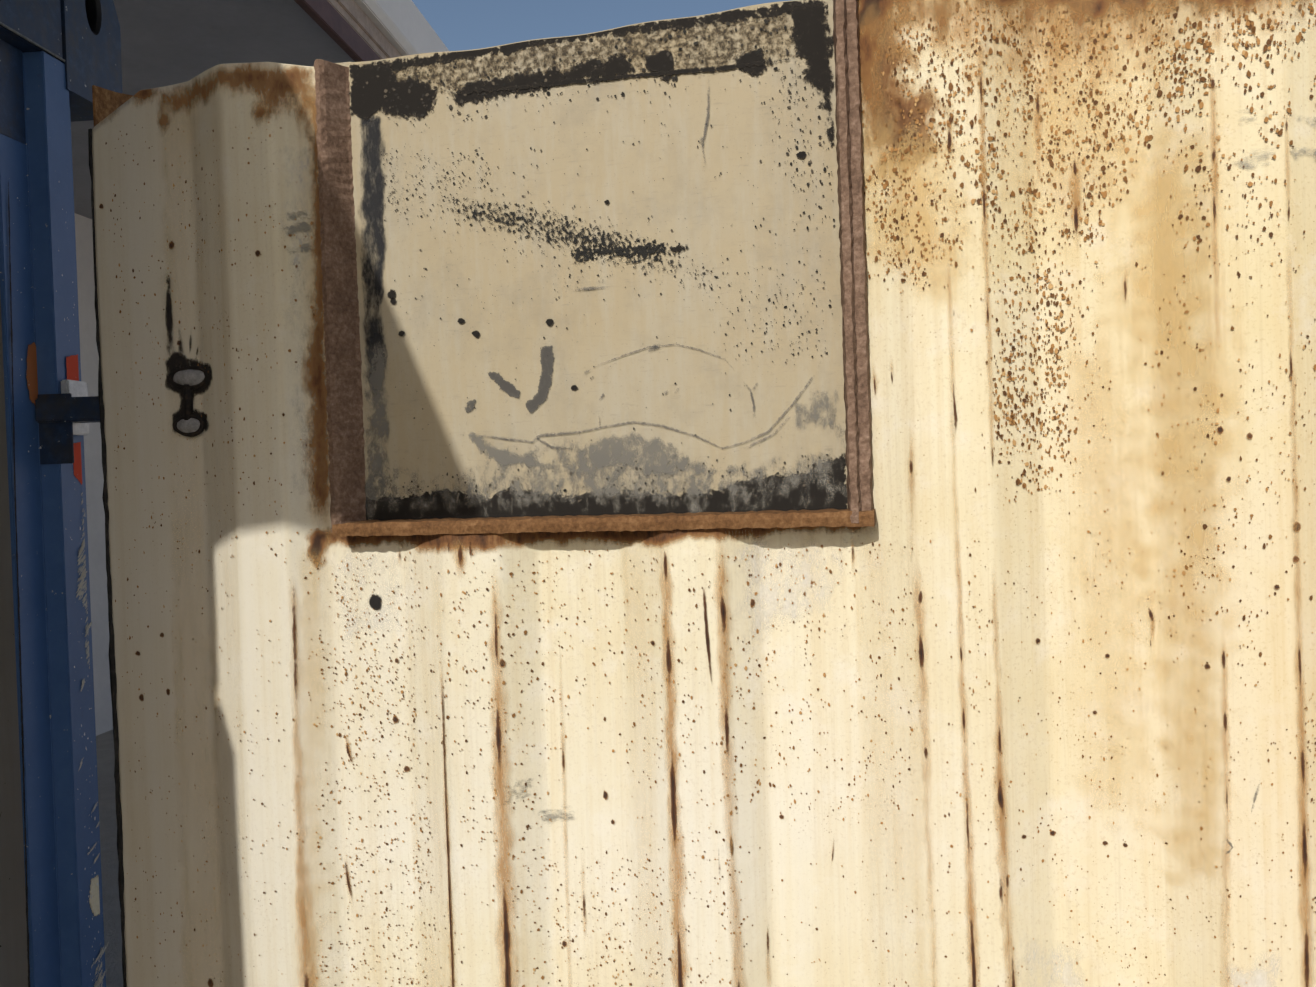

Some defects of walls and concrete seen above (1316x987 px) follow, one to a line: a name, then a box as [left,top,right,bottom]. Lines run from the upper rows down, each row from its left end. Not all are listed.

water stain [453,50,674,107]
water stain [735,49,767,77]
water stain [788,0,834,147]
water stain [348,62,848,521]
peeling [76,492,92,691]
corrosion [105,63,1052,987]
corrosion [1123,301,1316,687]
peeling [88,802,101,916]
corrosion [905,730,1166,987]